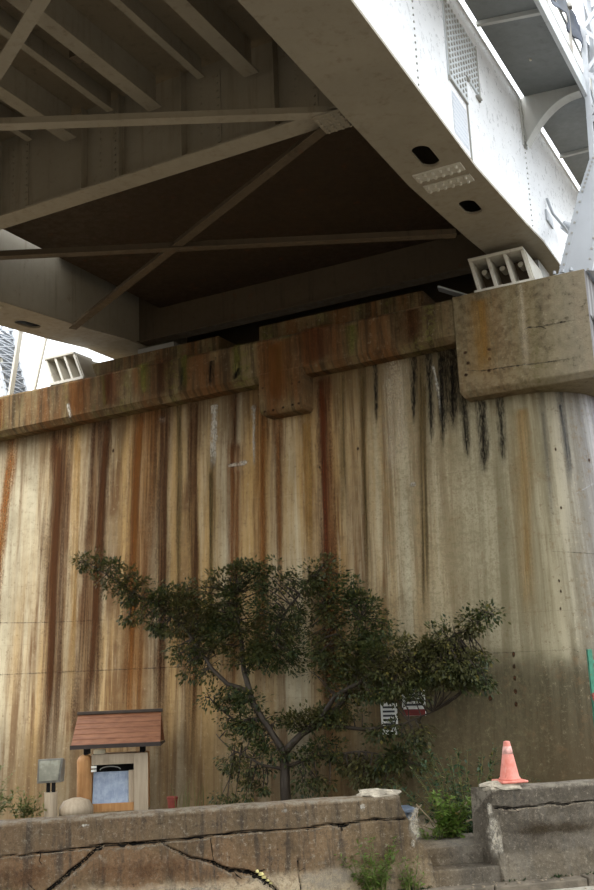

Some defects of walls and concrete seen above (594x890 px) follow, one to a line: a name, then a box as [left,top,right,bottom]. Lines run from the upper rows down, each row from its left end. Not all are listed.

corrosion [0,439,17,588]
corrosion [43,420,114,728]
corrosion [125,404,199,709]
corrosion [229,393,240,582]
corrosion [257,402,300,642]
corrosion [317,378,339,703]
corrosion [420,360,428,570]
leakage [411,348,489,464]
leakage [497,397,506,454]
crack [0,818,405,890]